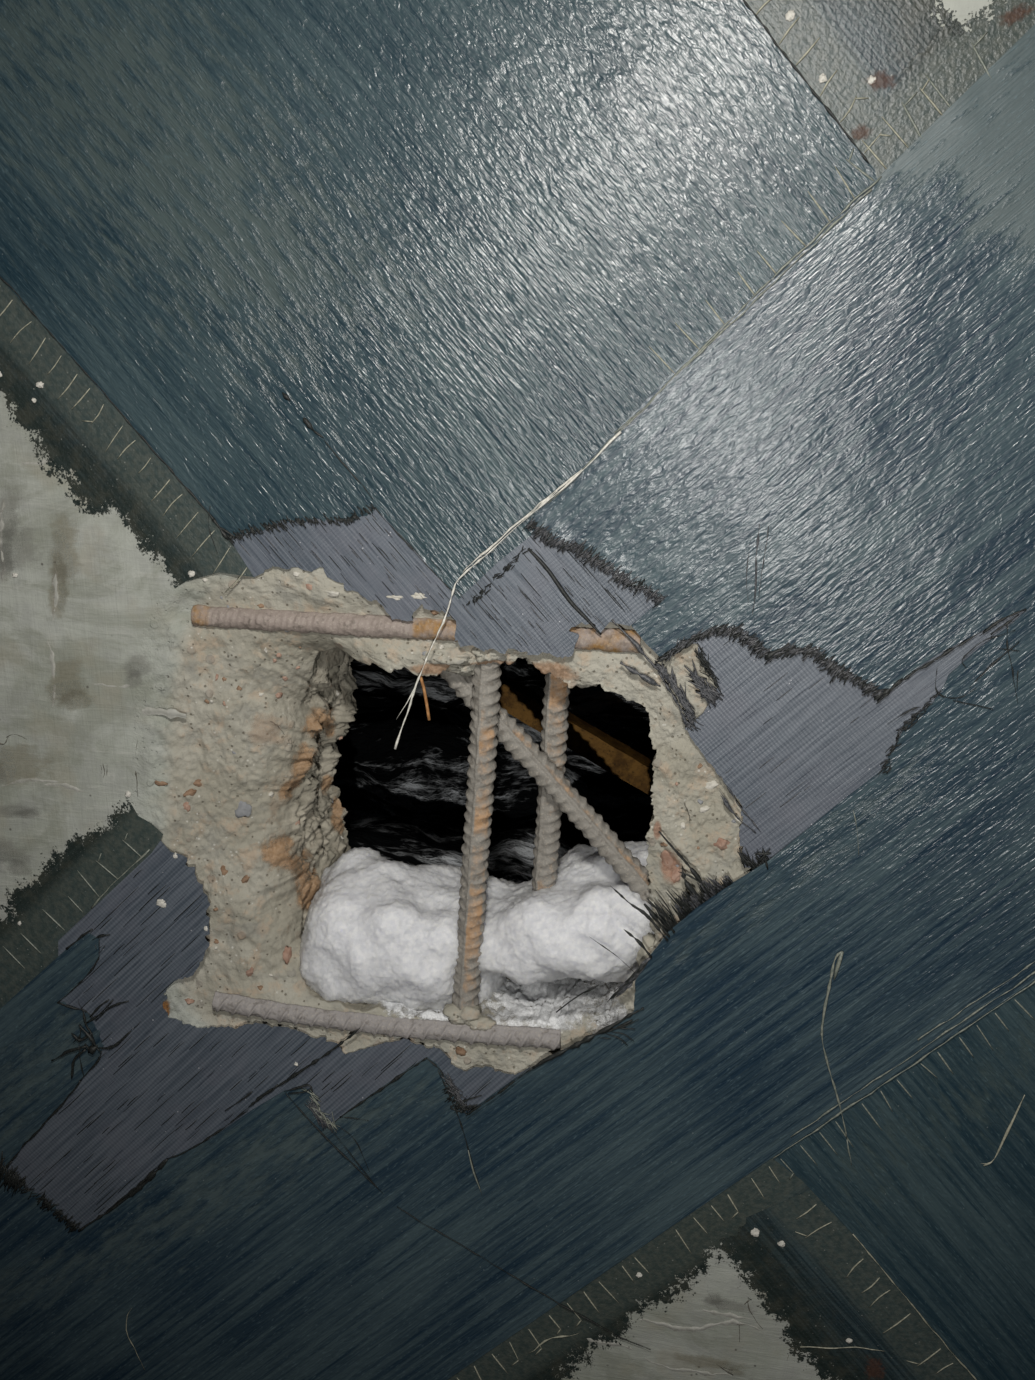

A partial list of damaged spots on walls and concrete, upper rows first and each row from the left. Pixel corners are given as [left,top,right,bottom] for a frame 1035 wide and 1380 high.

corrosion [414,664,450,674]
corrosion [534,663,572,679]
corrosion [279,708,344,834]
spalling [0,417,1027,1233]
corrosion [262,836,321,909]